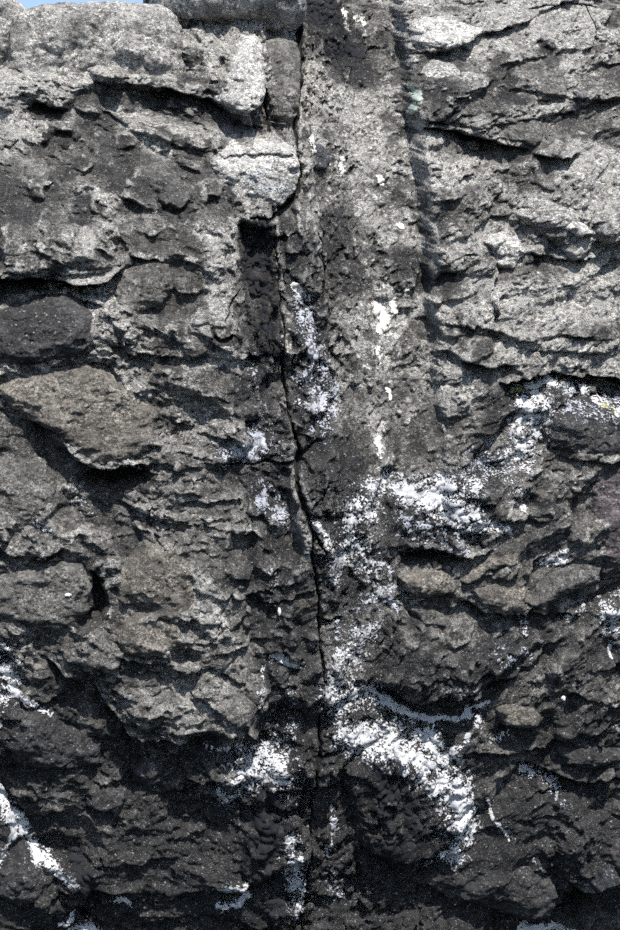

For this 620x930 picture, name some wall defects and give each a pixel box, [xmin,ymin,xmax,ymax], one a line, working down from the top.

crack [263,29,305,220]
crack [230,252,343,926]